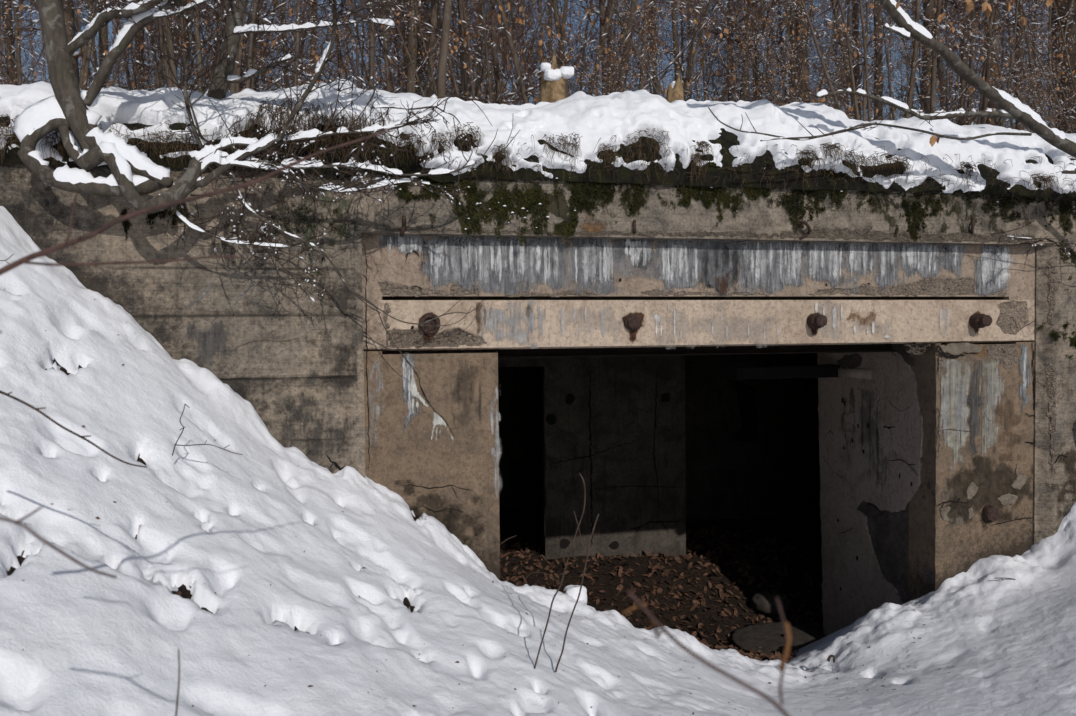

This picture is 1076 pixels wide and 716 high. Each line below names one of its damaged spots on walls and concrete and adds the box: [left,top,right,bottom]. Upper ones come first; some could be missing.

water stain [192,174,360,267]
water stain [379,177,1076,349]
water stain [187,321,226,364]
corrosion [622,312,644,341]
spalling [997,300,1029,334]
crack [547,372,680,545]
peeling [817,342,945,636]
peeling [940,482,979,525]
peeling [998,464,1027,506]